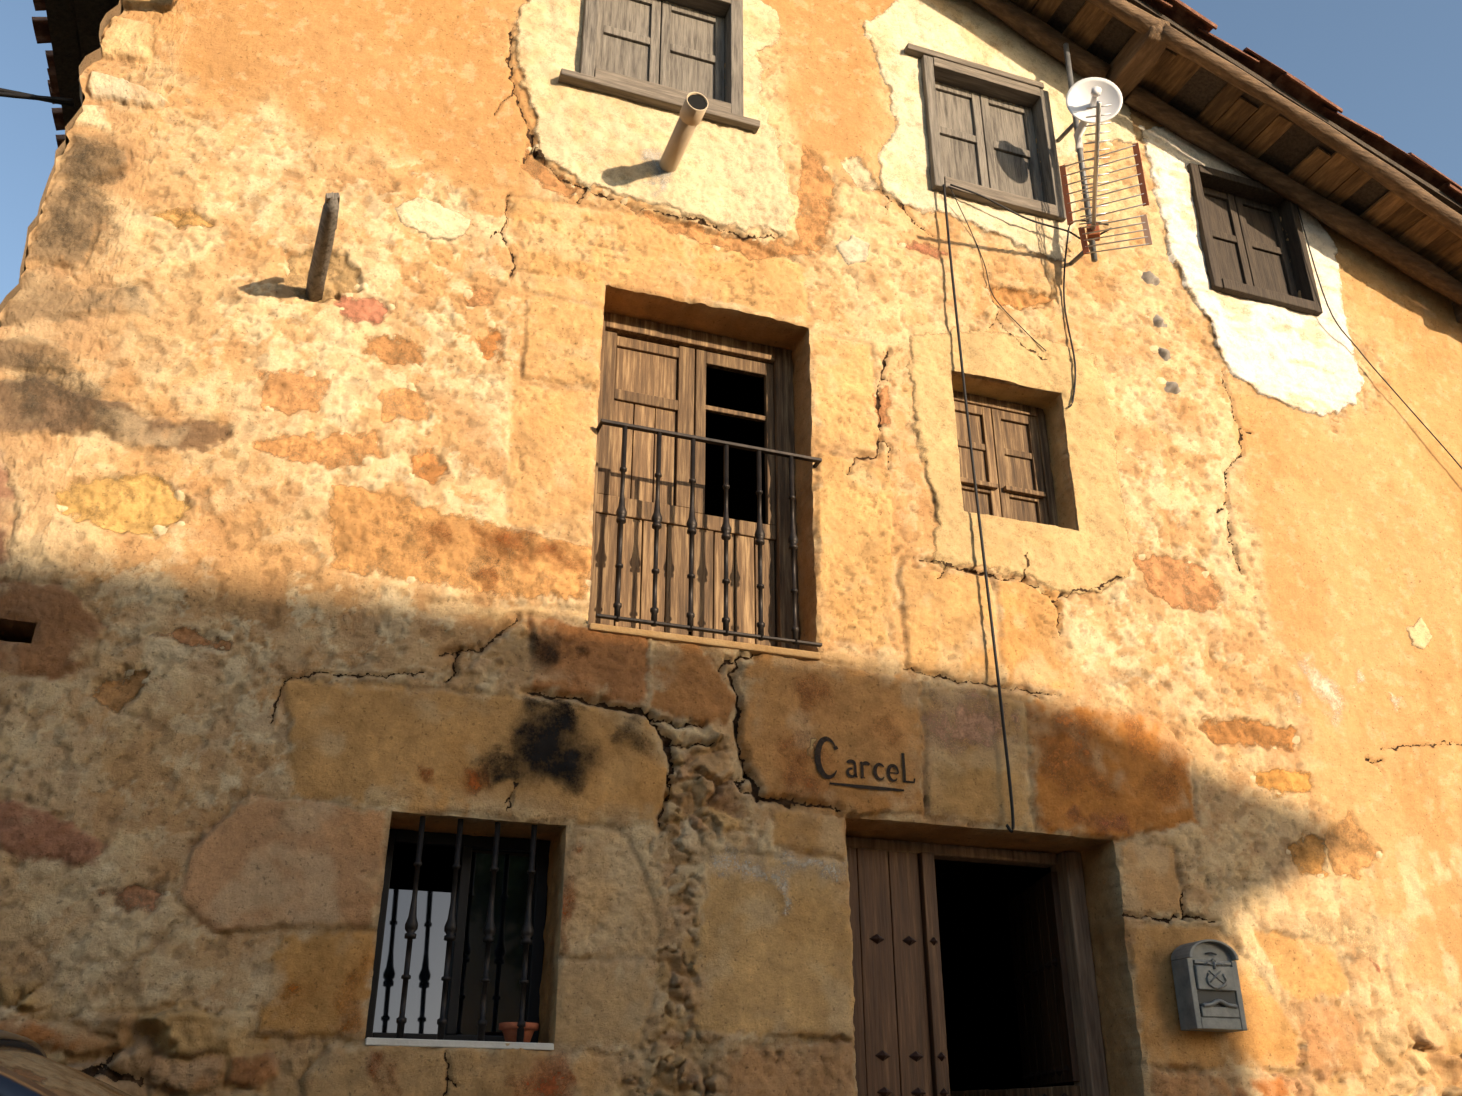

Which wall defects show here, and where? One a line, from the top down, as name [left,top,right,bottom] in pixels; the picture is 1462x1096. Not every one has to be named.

crack [490,27,787,277]
damp [464,699,596,793]
crack [1365,740,1462,772]